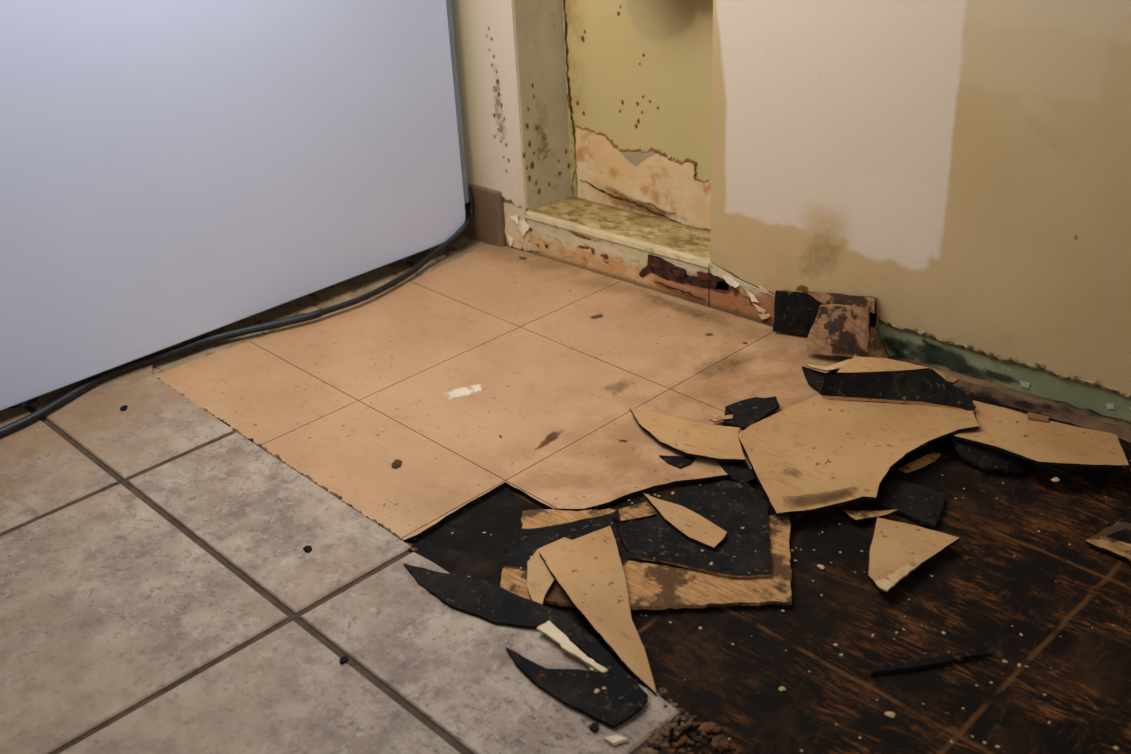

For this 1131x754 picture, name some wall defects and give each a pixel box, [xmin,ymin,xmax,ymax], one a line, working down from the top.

leakage [523,84,570,195]
flaking render [575,126,711,229]
peeling [505,213,548,255]
spalling [639,254,770,319]
leakage [883,337,1016,383]
flaking render [537,621,608,673]
flaking render [604,735,628,746]
spalling [634,678,693,754]